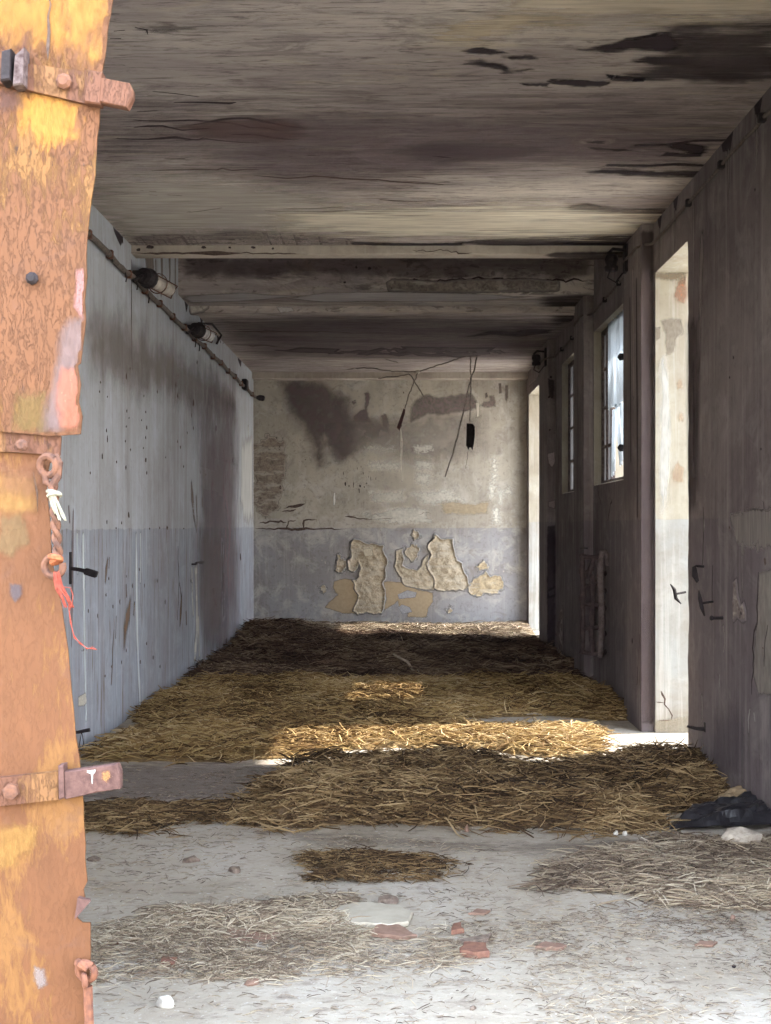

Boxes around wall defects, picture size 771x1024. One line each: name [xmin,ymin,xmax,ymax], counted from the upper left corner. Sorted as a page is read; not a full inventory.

water stain [463,24,771,87]
water stain [285,381,391,464]
water stain [411,383,508,421]
crack [256,504,392,531]
flaking render [319,529,505,618]
rust [111,585,135,685]